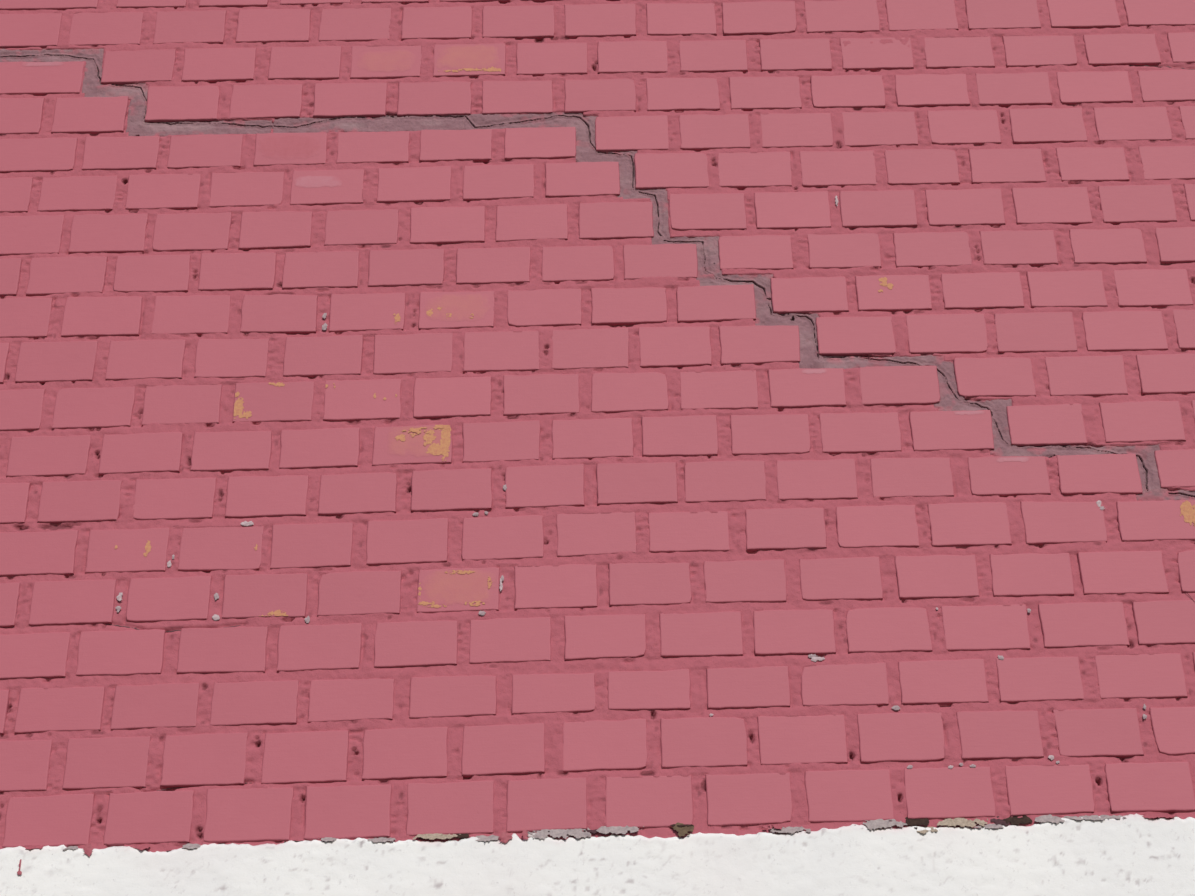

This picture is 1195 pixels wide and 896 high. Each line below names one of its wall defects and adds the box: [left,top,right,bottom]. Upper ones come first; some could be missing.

crack [0,48,1195,501]
peeling [395,425,451,461]
peeling [1180,501,1195,526]